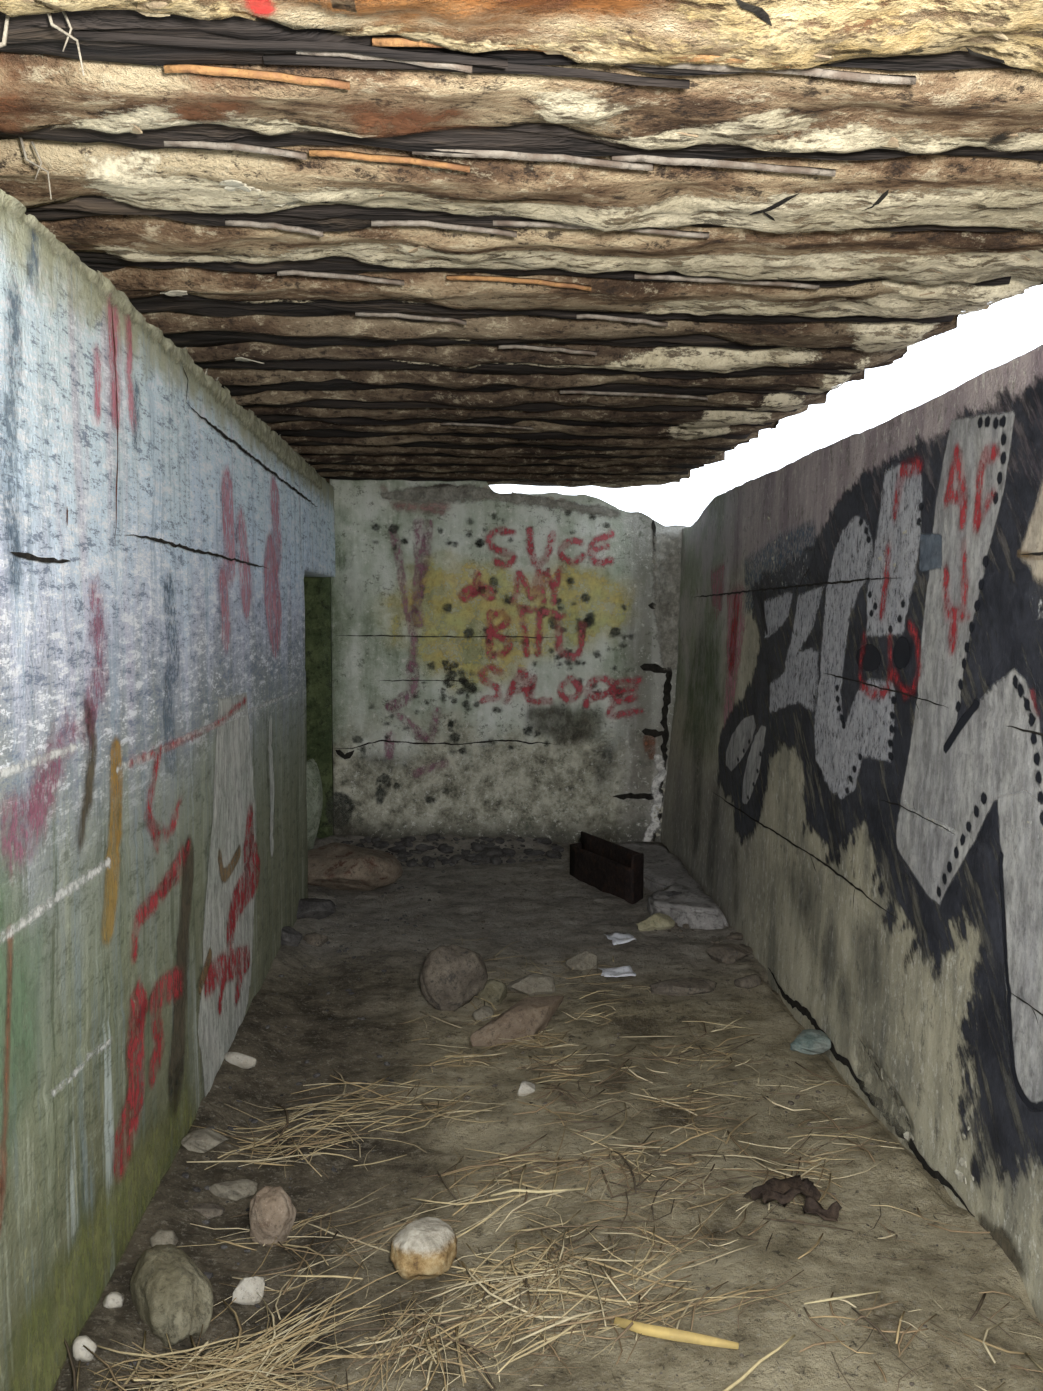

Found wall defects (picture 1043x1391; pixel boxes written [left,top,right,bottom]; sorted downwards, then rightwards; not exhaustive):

peeling [0,0,254,20]
corrosion [314,0,644,26]
peeling [346,0,1043,73]
corrosion [825,0,898,34]
peeling [534,89,1043,154]
peeling [55,104,1043,440]
spalling [0,189,323,489]
crack [133,534,268,569]
water stain [375,773,399,804]
water stain [326,792,383,838]
crack [768,968,975,1217]